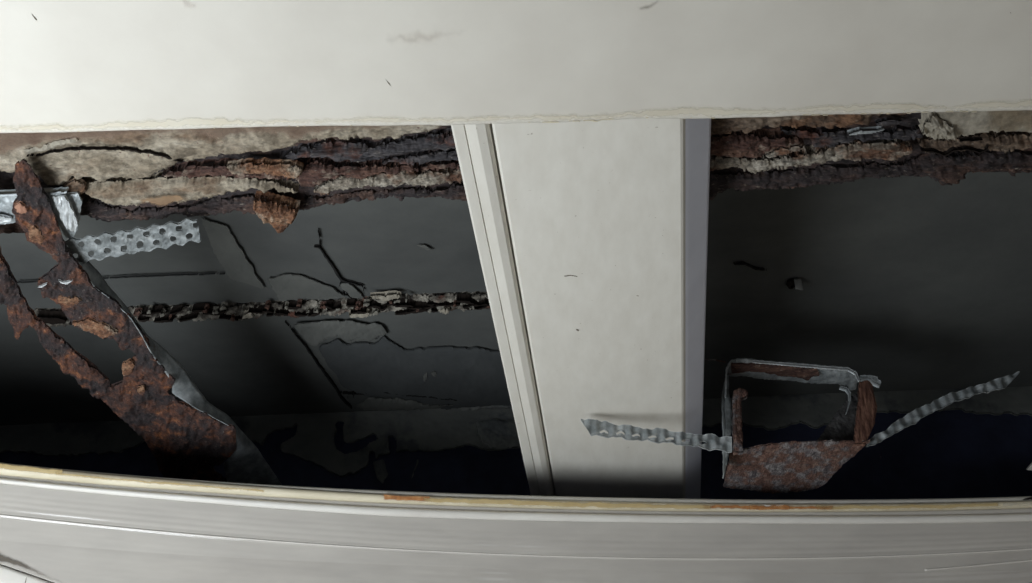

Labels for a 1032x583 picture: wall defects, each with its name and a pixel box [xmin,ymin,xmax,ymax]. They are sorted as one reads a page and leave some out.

rust [0,126,467,233]
spalling [0,108,773,206]
rust [709,113,1032,195]
spalling [802,101,1032,153]
crack [314,228,364,300]
hole [37,310,72,325]
peeling [138,217,521,484]
crack [285,320,457,409]
rust [731,363,819,381]
rust [0,464,62,474]
peeling [0,420,145,456]